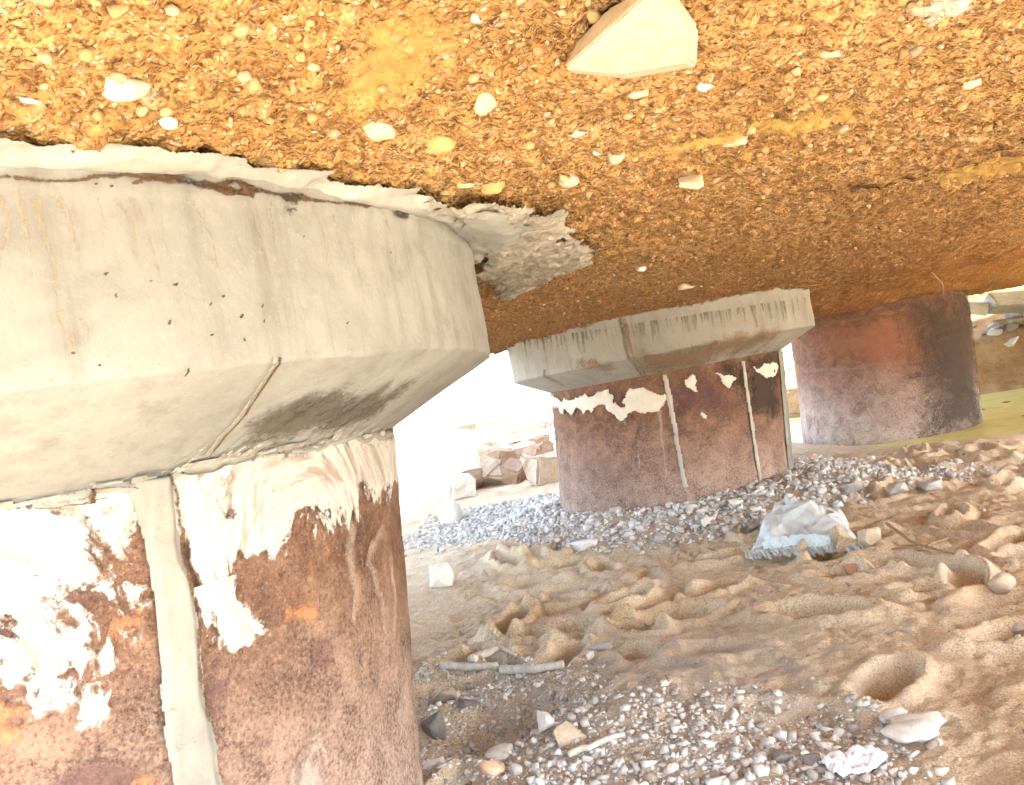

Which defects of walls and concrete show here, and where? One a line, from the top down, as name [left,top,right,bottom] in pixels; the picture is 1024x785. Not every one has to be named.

spalling [425,200,598,300]
water stain [247,382,410,446]
flaking render [551,387,667,421]
flaking render [685,374,698,392]
flaking render [716,373,736,388]
flaking render [753,362,778,378]
flaking render [159,421,398,653]
flaking render [0,483,152,731]